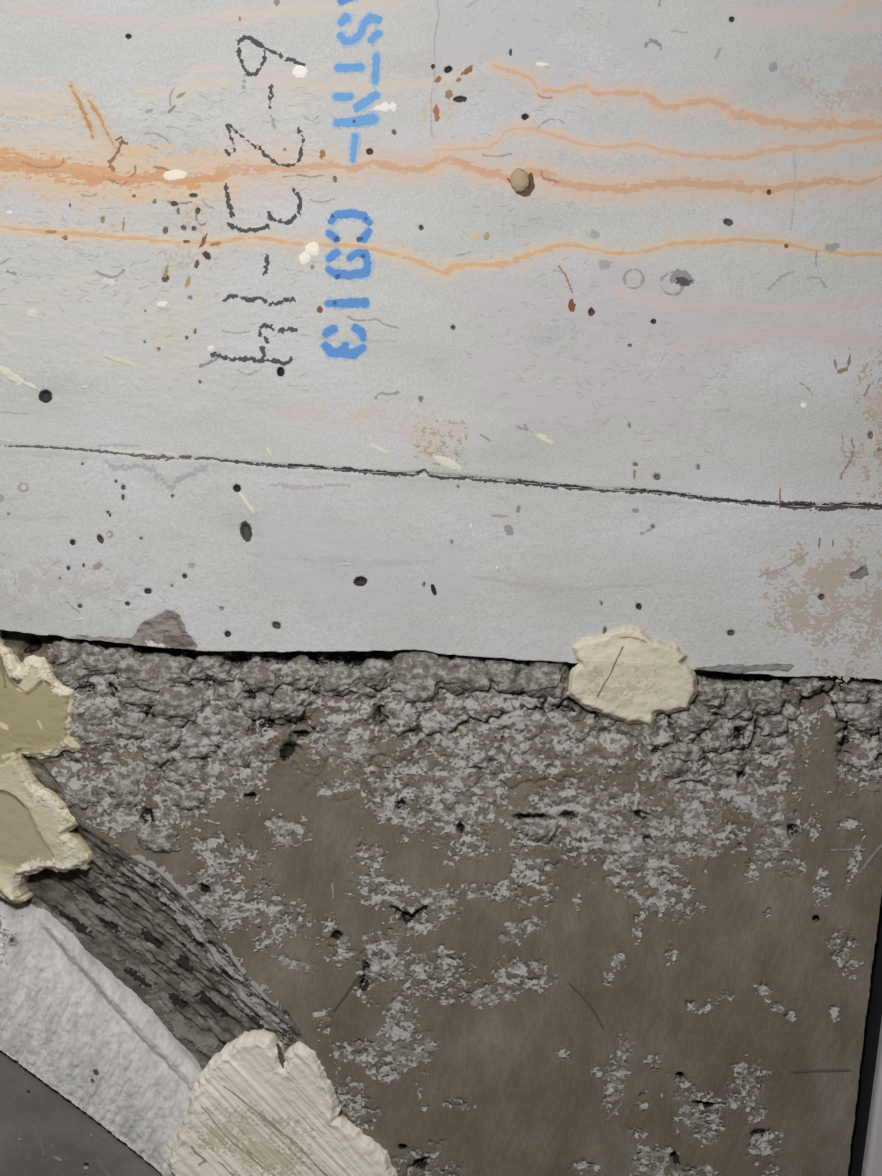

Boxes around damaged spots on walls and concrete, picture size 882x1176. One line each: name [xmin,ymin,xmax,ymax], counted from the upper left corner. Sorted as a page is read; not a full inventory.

crack [430,0,688,157]
crack [0,87,335,391]
crack [347,316,399,329]
corrosion [0,45,882,294]
crack [456,171,741,441]
crack [768,250,827,290]
crack [374,391,399,400]
crack [0,438,882,513]
flaking render [44,609,882,1132]
spalling [390,1140,463,1176]
spalling [570,1160,601,1176]
spalling [591,1033,784,1176]